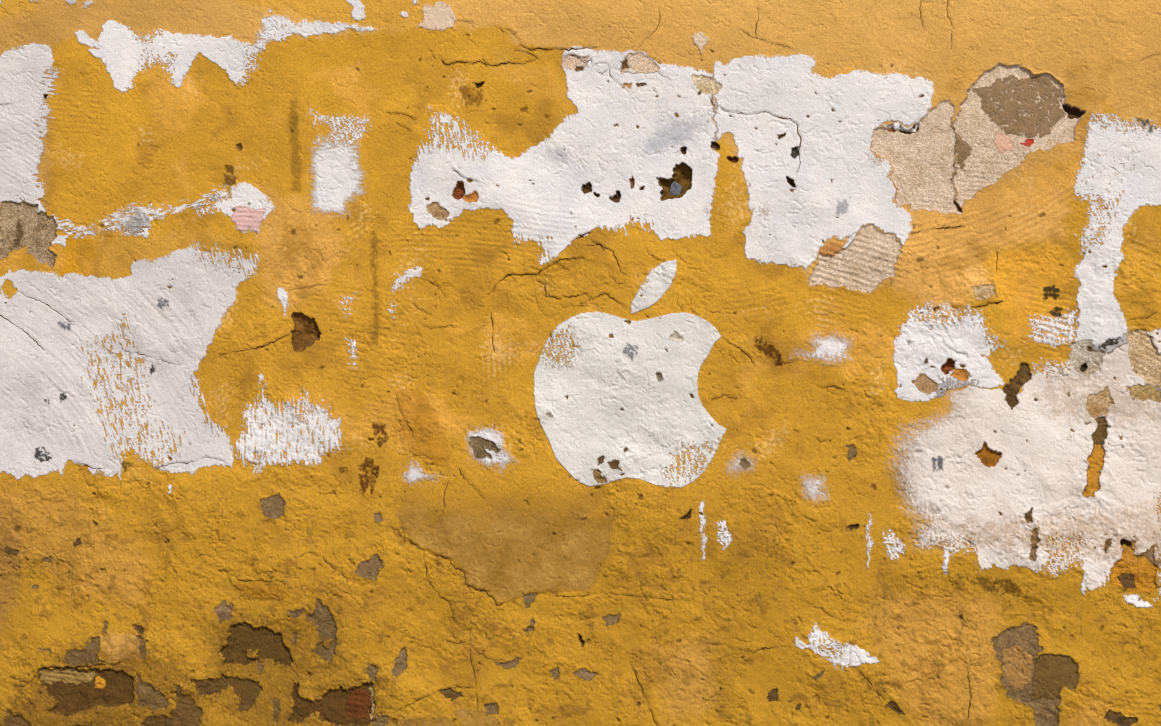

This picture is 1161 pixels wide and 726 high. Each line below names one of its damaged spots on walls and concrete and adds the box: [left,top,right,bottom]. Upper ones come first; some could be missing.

flaking render [871,63,1085,214]
flaking render [452,181,479,203]
flaking render [582,176,644,202]
flaking render [656,147,692,201]
flaking render [809,224,902,293]
peeling [914,358,969,395]
flaking render [1003,363,1032,410]
flaking render [975,442,1002,467]
flaking render [1083,386,1114,497]
flaking render [1103,539,1161,593]
flaking render [37,599,389,726]
flaking render [991,622,1079,726]